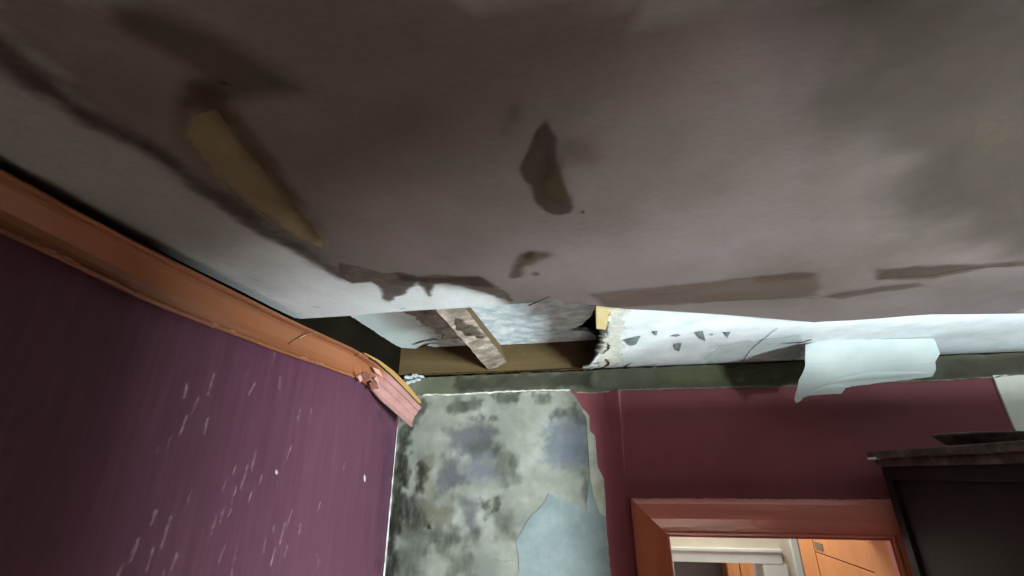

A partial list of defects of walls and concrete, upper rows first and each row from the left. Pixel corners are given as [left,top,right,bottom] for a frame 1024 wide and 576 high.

damp [0,42,513,309]
damp [523,124,573,215]
damp [594,273,819,307]
damp [862,262,1024,294]
peeling [357,367,384,391]
damp [456,372,592,391]
damp [656,366,804,386]
peeling [385,313,1024,576]